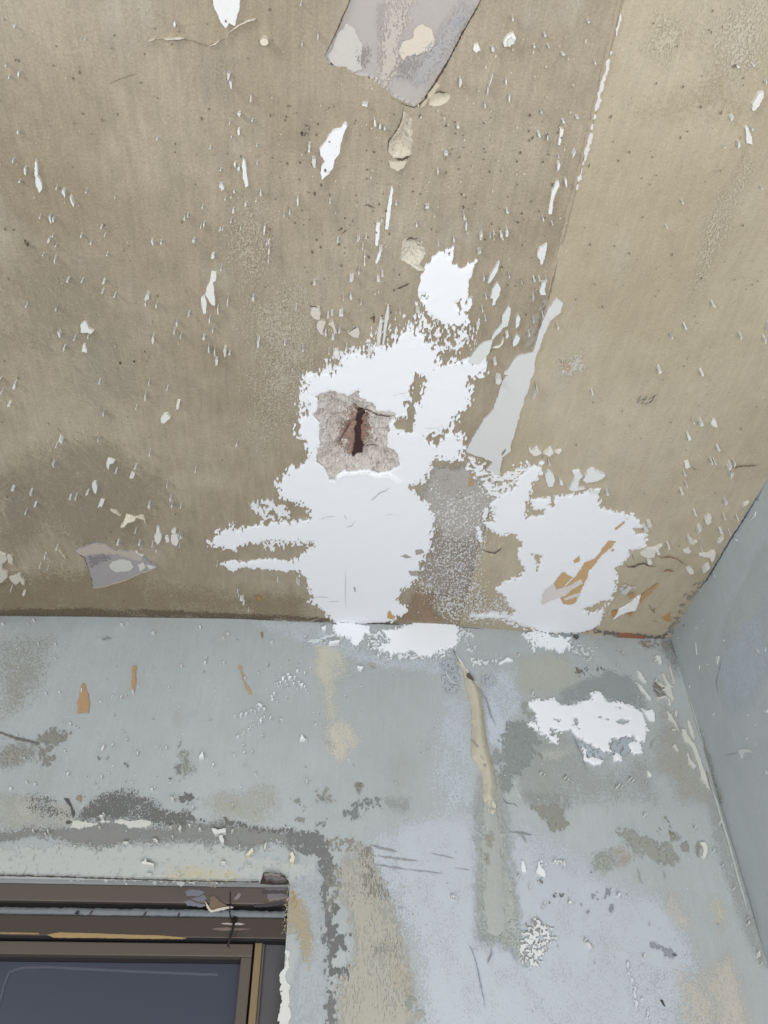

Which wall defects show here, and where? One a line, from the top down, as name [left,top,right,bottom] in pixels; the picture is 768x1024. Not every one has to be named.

peeling [320,121,347,179]
spalling [400,238,426,271]
peeling [537,242,547,265]
peeling [201,271,217,314]
peeling [487,260,501,305]
peeling [310,304,389,357]
rust [335,402,372,457]
spalling [313,390,399,480]
peeling [545,467,605,494]
peeling [75,542,158,589]
rust [77,684,90,714]
damp [0,742,412,836]